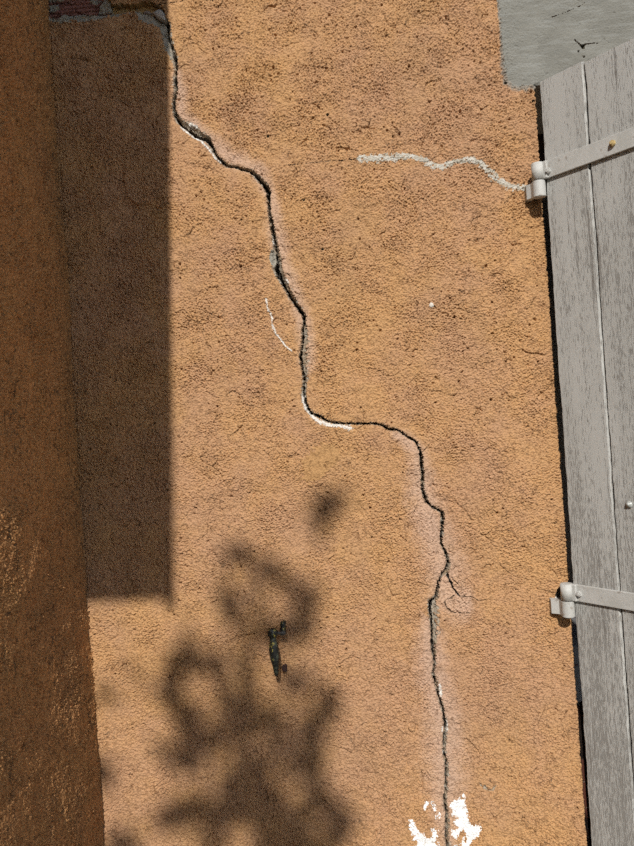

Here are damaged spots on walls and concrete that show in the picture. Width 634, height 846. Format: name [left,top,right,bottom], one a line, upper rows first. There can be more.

spalling [48,0,174,60]
crack [157,0,485,846]